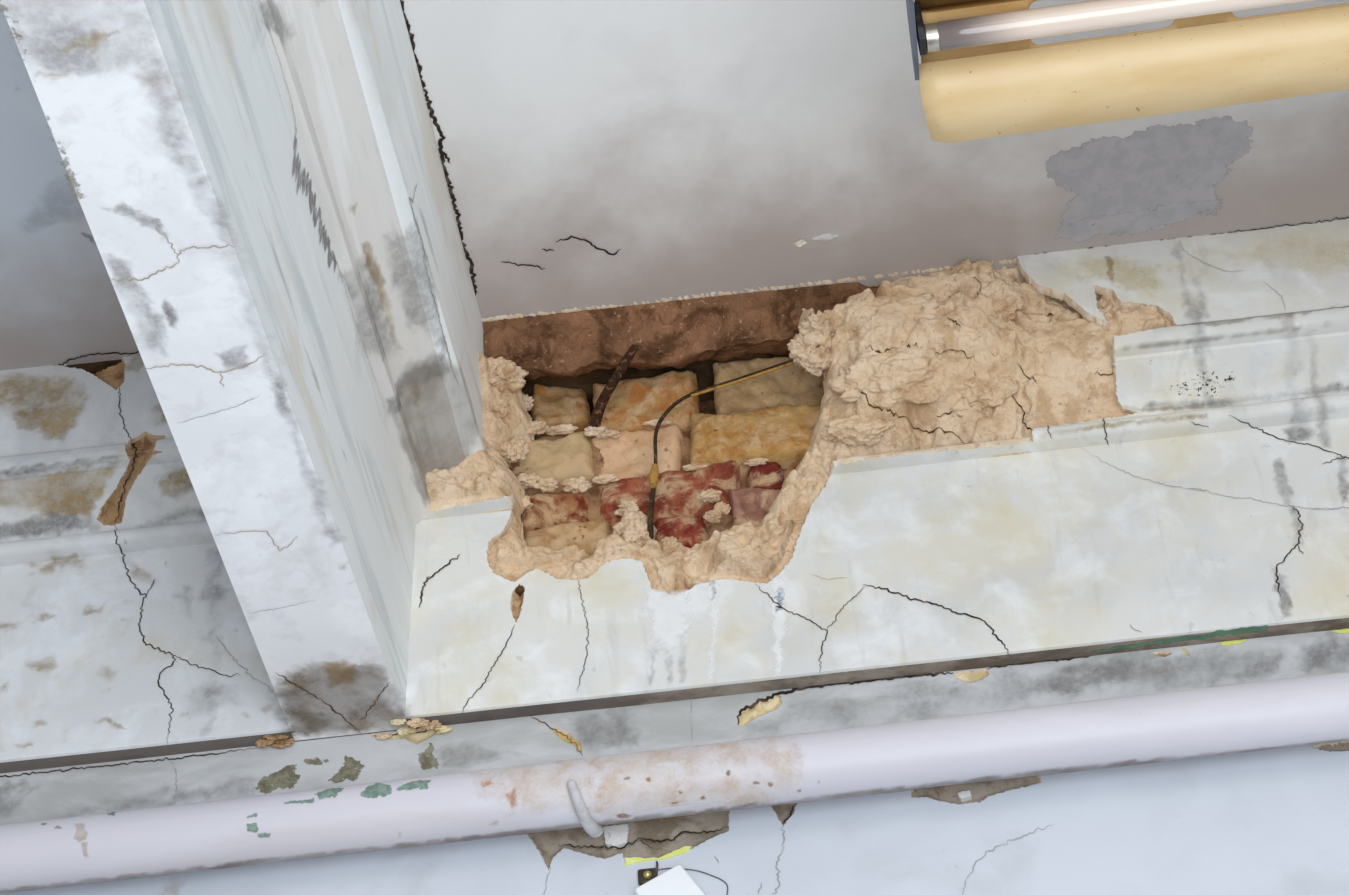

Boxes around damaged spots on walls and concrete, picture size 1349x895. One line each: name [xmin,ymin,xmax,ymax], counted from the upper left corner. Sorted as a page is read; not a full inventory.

crack [400,0,621,384]
damp [0,379,80,437]
damp [0,473,101,536]
spalling [97,431,165,526]
spalling [423,258,1177,622]
crack [1084,415,1349,597]
crack [419,554,460,607]
crack [0,526,388,800]
damp [280,669,407,733]
crack [737,574,1093,724]
peeling [361,780,431,798]
spalling [526,810,730,870]